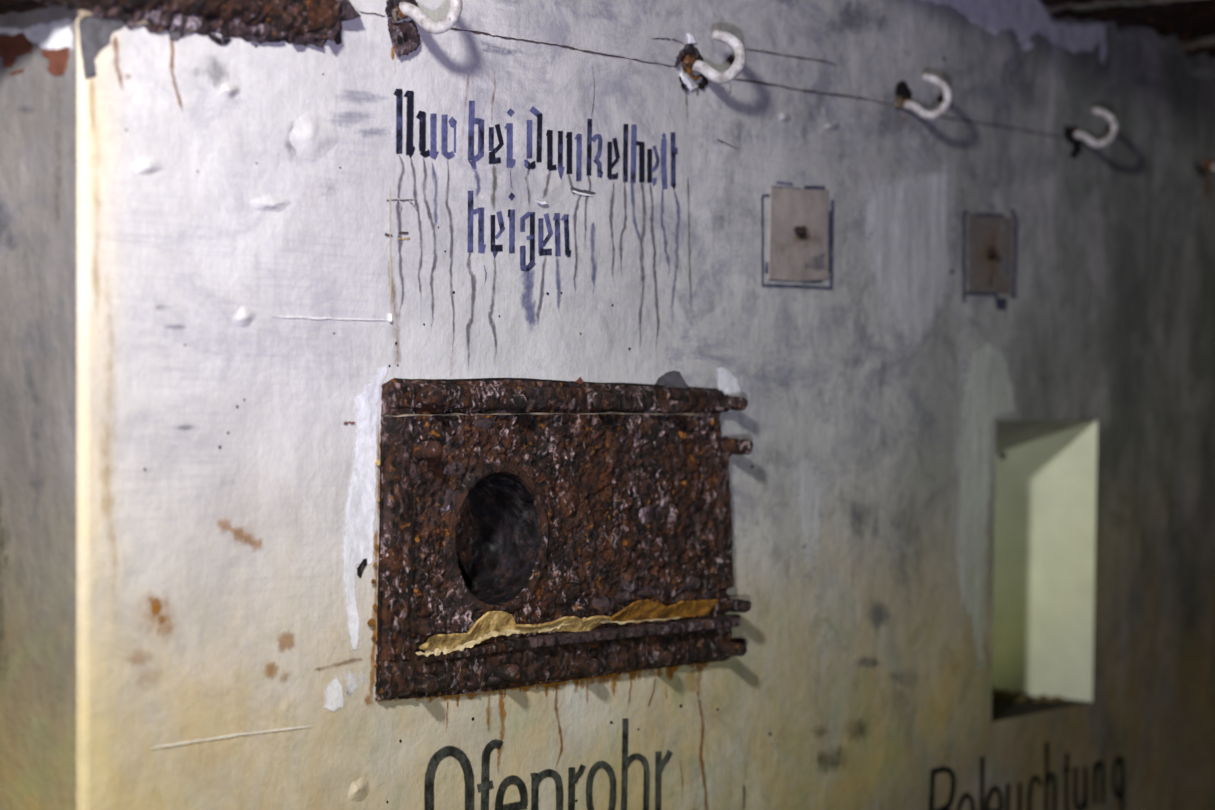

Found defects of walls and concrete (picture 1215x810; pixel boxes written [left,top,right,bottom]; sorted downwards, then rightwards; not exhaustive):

peeling [0,9,125,79]
rust [65,0,361,107]
rust [437,461,466,513]
rust [639,504,654,524]
rust [365,531,383,704]
rust [564,576,701,614]
rust [417,662,709,810]